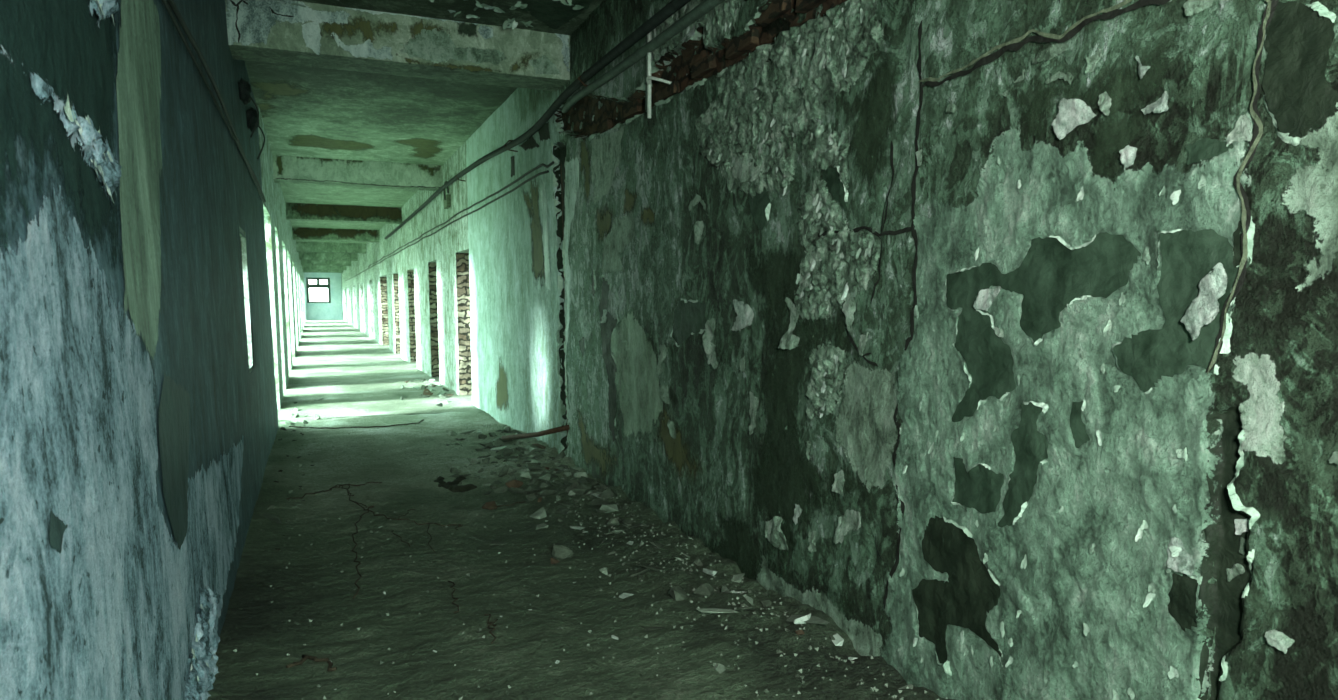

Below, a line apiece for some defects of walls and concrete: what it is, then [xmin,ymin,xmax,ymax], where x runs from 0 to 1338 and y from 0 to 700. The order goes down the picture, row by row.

peeling [0,0,244,700]
peeling [225,0,593,72]
peeling [591,211,677,443]
flaking render [511,0,860,358]
peeling [702,299,754,369]
peeling [748,391,759,435]
crack [875,400,905,610]
crack [818,0,1170,367]
peeling [756,0,1338,700]
crack [1206,0,1279,374]